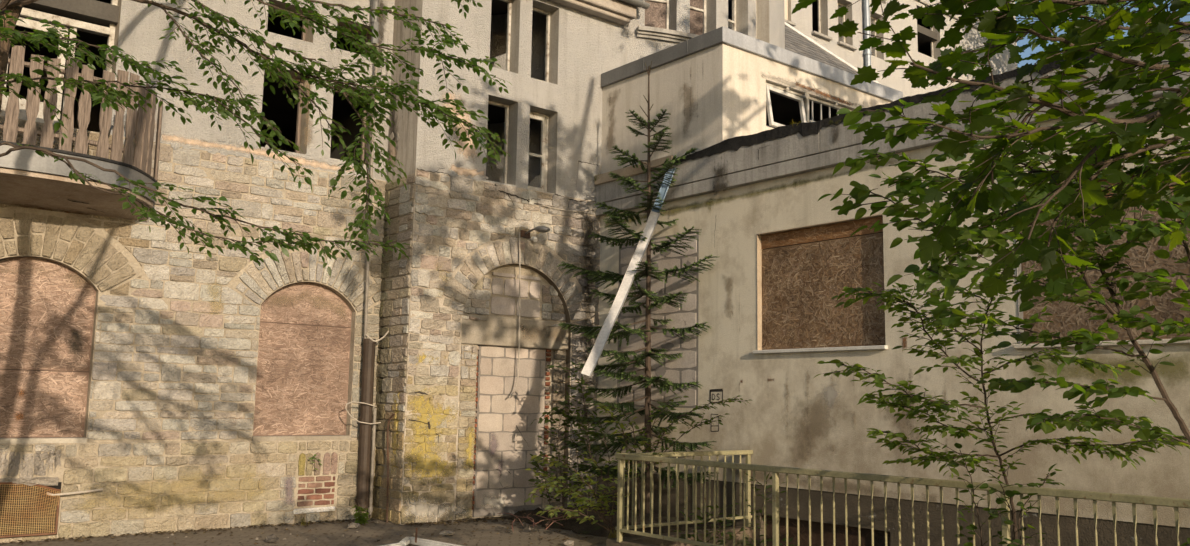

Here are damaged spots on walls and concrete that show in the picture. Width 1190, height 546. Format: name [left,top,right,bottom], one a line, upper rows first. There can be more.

flaking render [293,452,338,514]